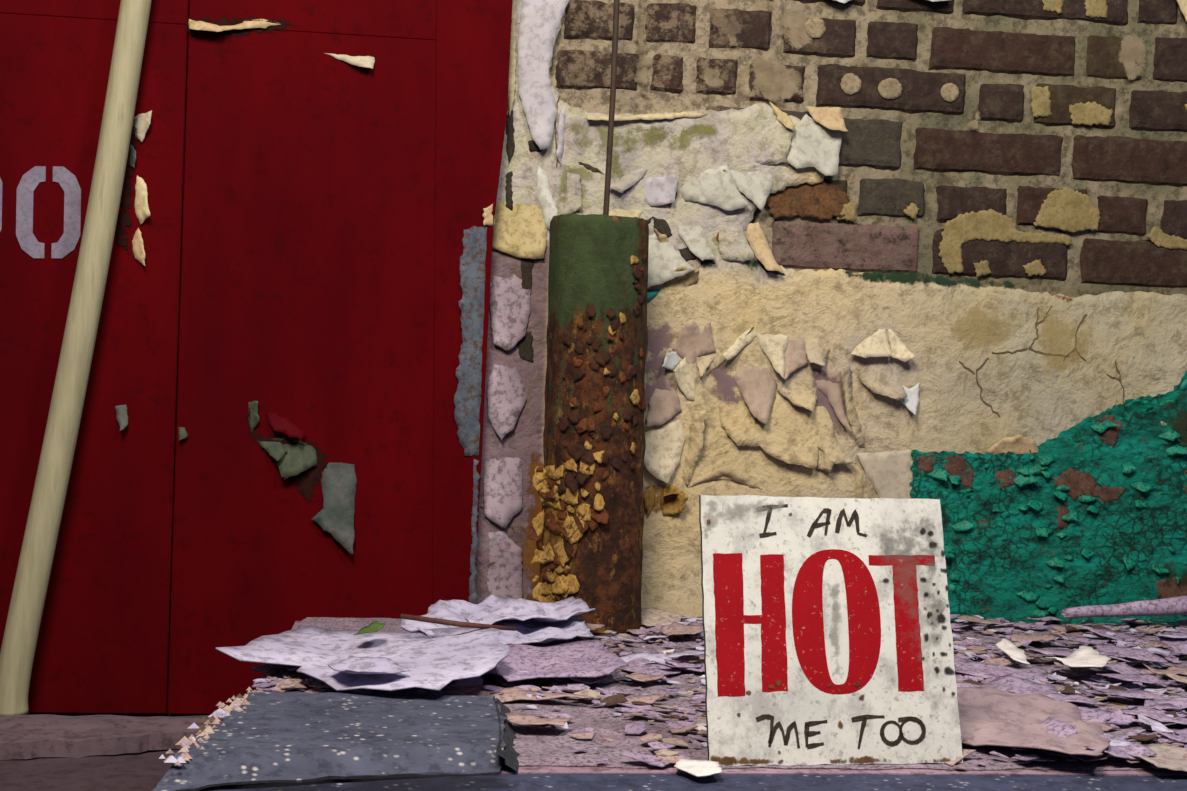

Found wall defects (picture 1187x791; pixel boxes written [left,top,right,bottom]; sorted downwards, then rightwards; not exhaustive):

peeling [1084,0,1108,18]
peeling [1176,0,1187,23]
peeling [878,78,902,99]
peeling [940,83,959,102]
peeling [1069,101,1113,126]
peeling [938,187,1101,278]
peeling [1146,226,1187,250]
peeling [454,0,861,604]
crack [959,306,1125,417]
peeling [246,401,357,555]
corrosion [520,441,609,603]
peeling [643,319,1187,772]